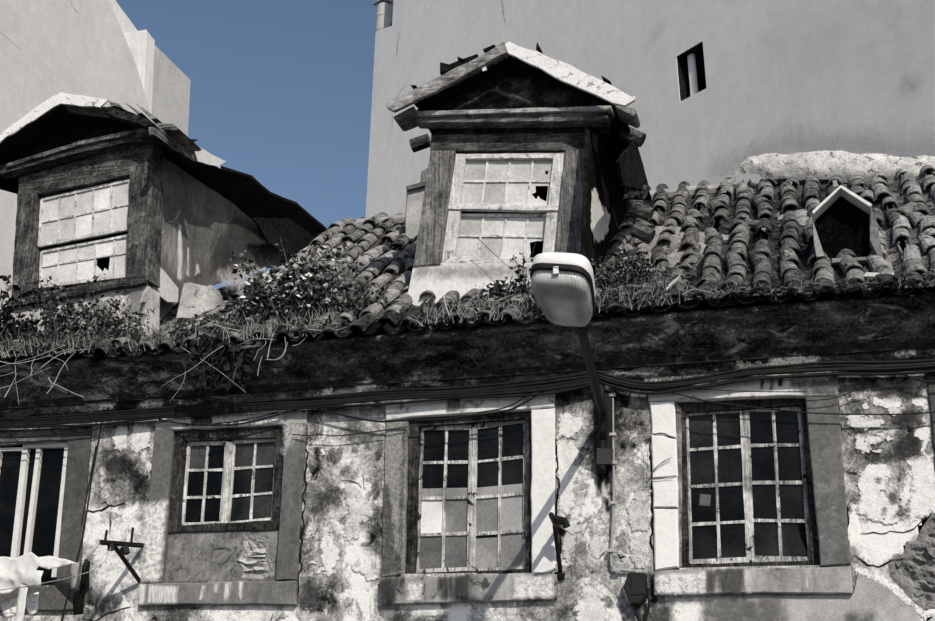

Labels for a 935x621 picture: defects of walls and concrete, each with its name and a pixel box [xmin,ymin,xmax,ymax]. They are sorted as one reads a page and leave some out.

flaking render [112,424,152,453]
water stain [347,421,374,448]
flaking render [309,485,380,589]
water stain [378,485,424,621]
water stain [631,568,786,621]
flaking render [846,376,935,621]